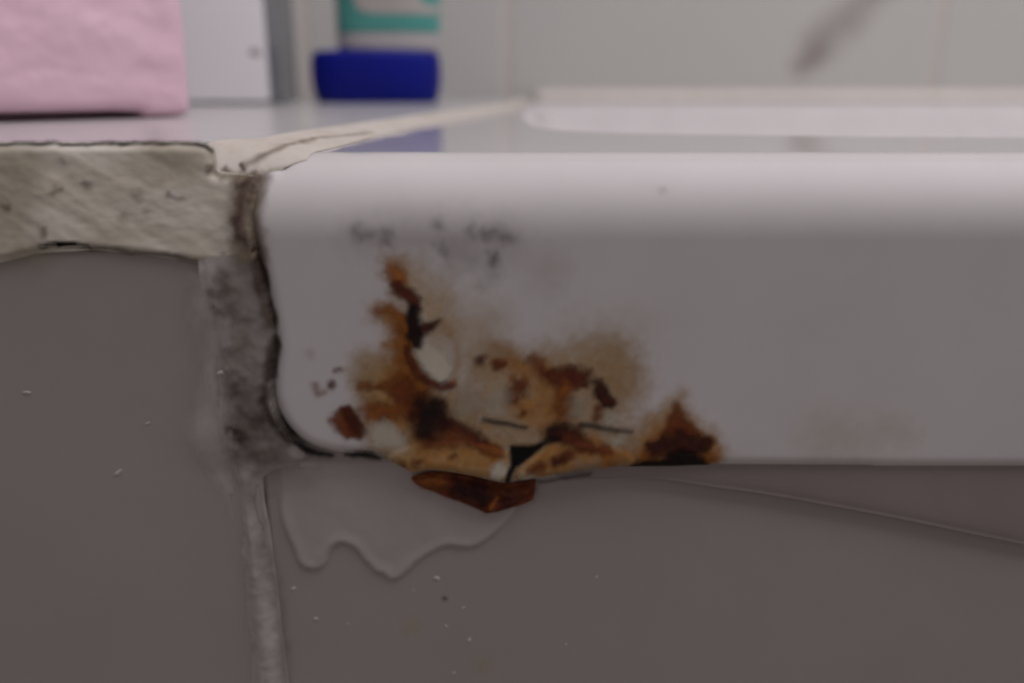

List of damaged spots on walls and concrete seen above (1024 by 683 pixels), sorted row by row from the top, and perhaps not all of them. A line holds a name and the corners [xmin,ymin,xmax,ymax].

mould [208,147,296,444]
corrosion [330,262,722,513]